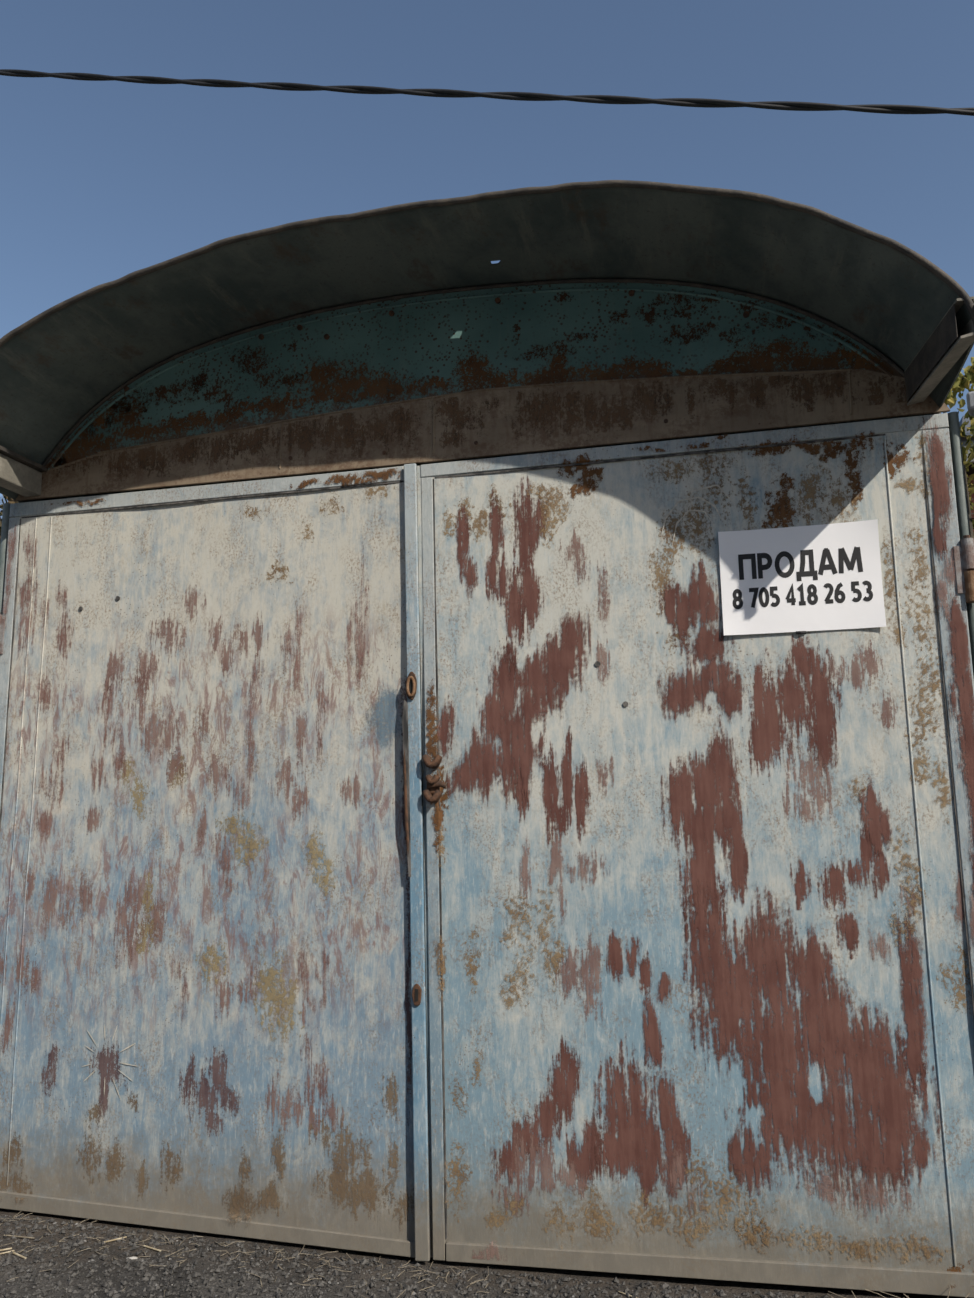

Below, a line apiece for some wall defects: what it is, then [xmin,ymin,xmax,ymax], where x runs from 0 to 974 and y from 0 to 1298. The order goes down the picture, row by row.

corrosion [47,335,916,481]
corrosion [443,483,512,542]
corrosion [526,453,604,549]
corrosion [889,825,928,947]
corrosion [382,1071,399,1121]
corrosion [0,1132,33,1205]
corrosion [78,1103,183,1196]
corrosion [222,1126,286,1223]
corrosion [308,1115,413,1225]